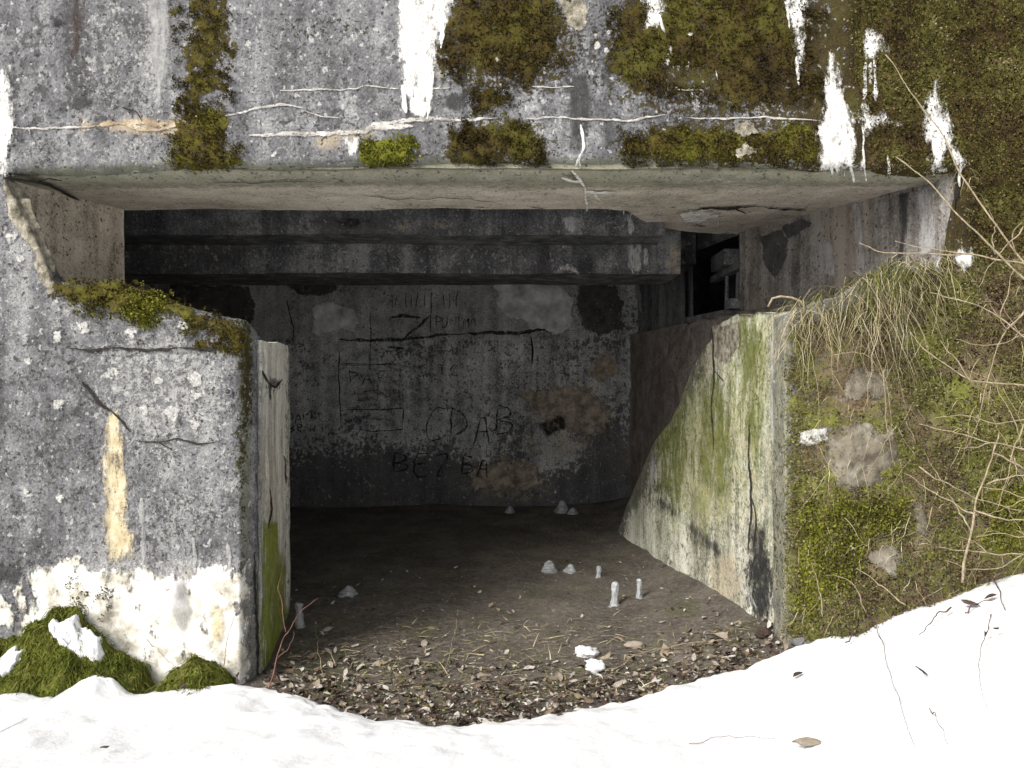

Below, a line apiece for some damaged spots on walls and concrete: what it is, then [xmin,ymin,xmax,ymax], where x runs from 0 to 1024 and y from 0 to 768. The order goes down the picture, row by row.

water stain [398,0,453,119]
water stain [818,30,899,182]
water stain [925,81,964,187]
spalling [2,179,57,295]
crack [69,344,226,353]
crack [82,381,222,450]
water stain [0,410,251,685]
water stain [689,524,721,554]
crack [747,425,756,544]
water stain [746,523,773,620]